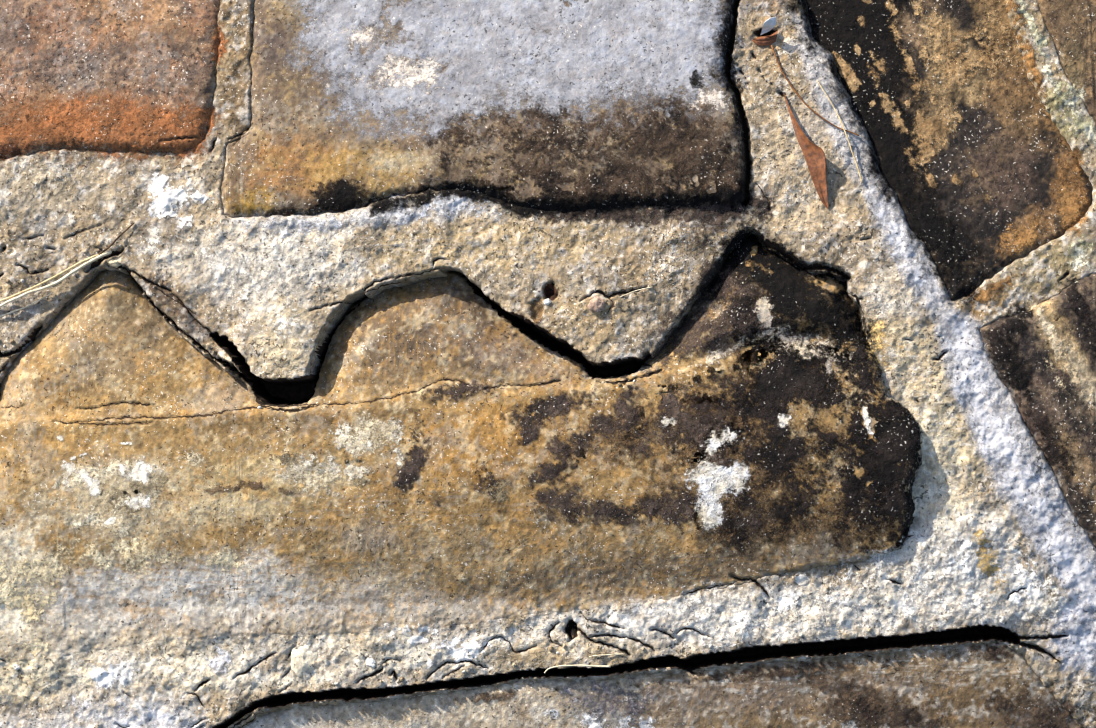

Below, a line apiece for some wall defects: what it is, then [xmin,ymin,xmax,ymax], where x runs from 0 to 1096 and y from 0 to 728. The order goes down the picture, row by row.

spalling [529,283,558,325]
efflorescence [865,183,946,304]
damp [594,299,1096,671]
crack [190,617,1067,728]